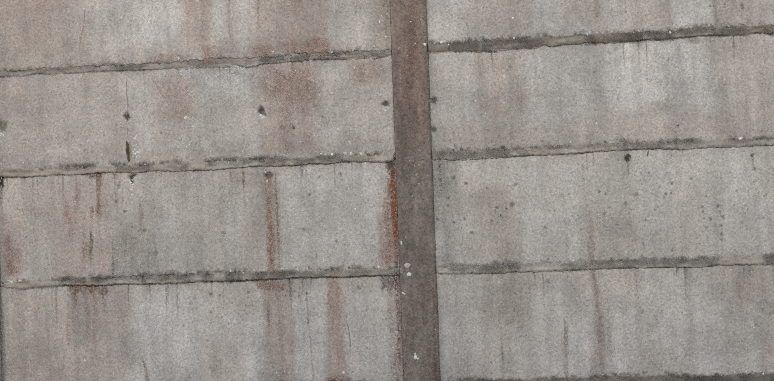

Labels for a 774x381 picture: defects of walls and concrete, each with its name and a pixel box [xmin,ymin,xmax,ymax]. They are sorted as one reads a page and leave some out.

crack [2,133,383,178]
rust [381,168,398,265]